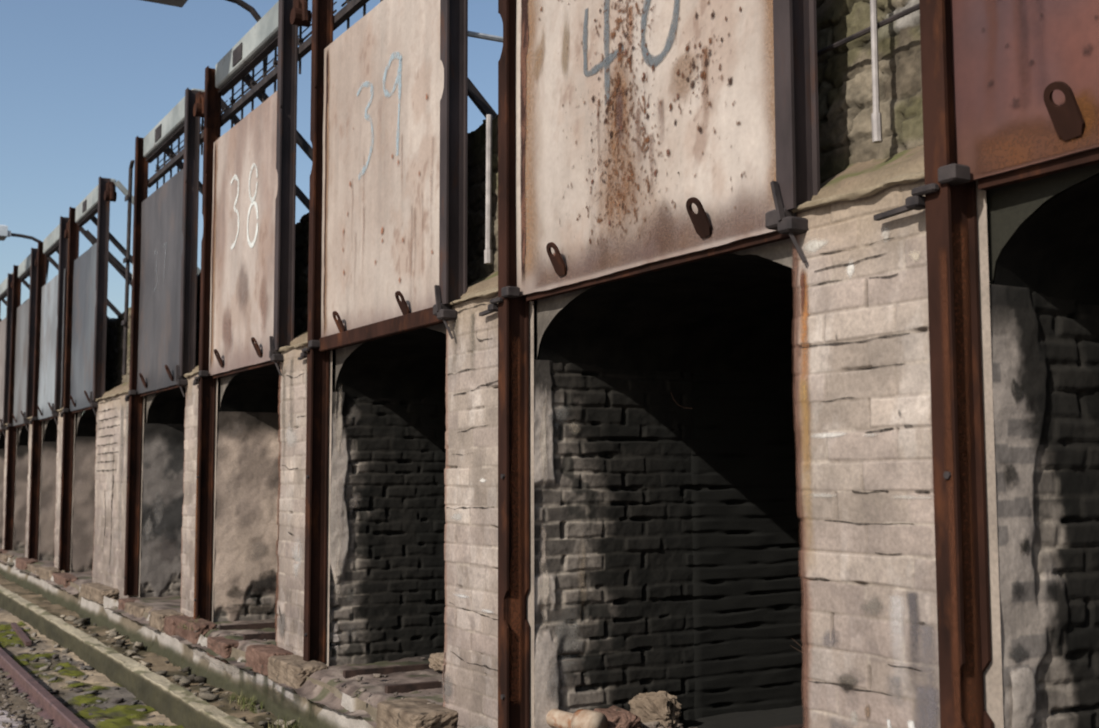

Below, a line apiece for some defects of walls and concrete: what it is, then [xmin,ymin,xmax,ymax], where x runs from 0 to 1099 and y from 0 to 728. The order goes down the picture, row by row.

rust [520,0,765,286]
rust [977,96,1099,174]
crack [801,333,909,370]
peeling [335,398,359,451]
peeling [540,400,579,472]
crack [866,425,913,433]
crack [852,488,888,496]
crack [825,518,912,526]
peeling [334,561,354,600]
peeling [539,527,550,620]
peeling [547,616,581,703]
crack [810,681,891,696]